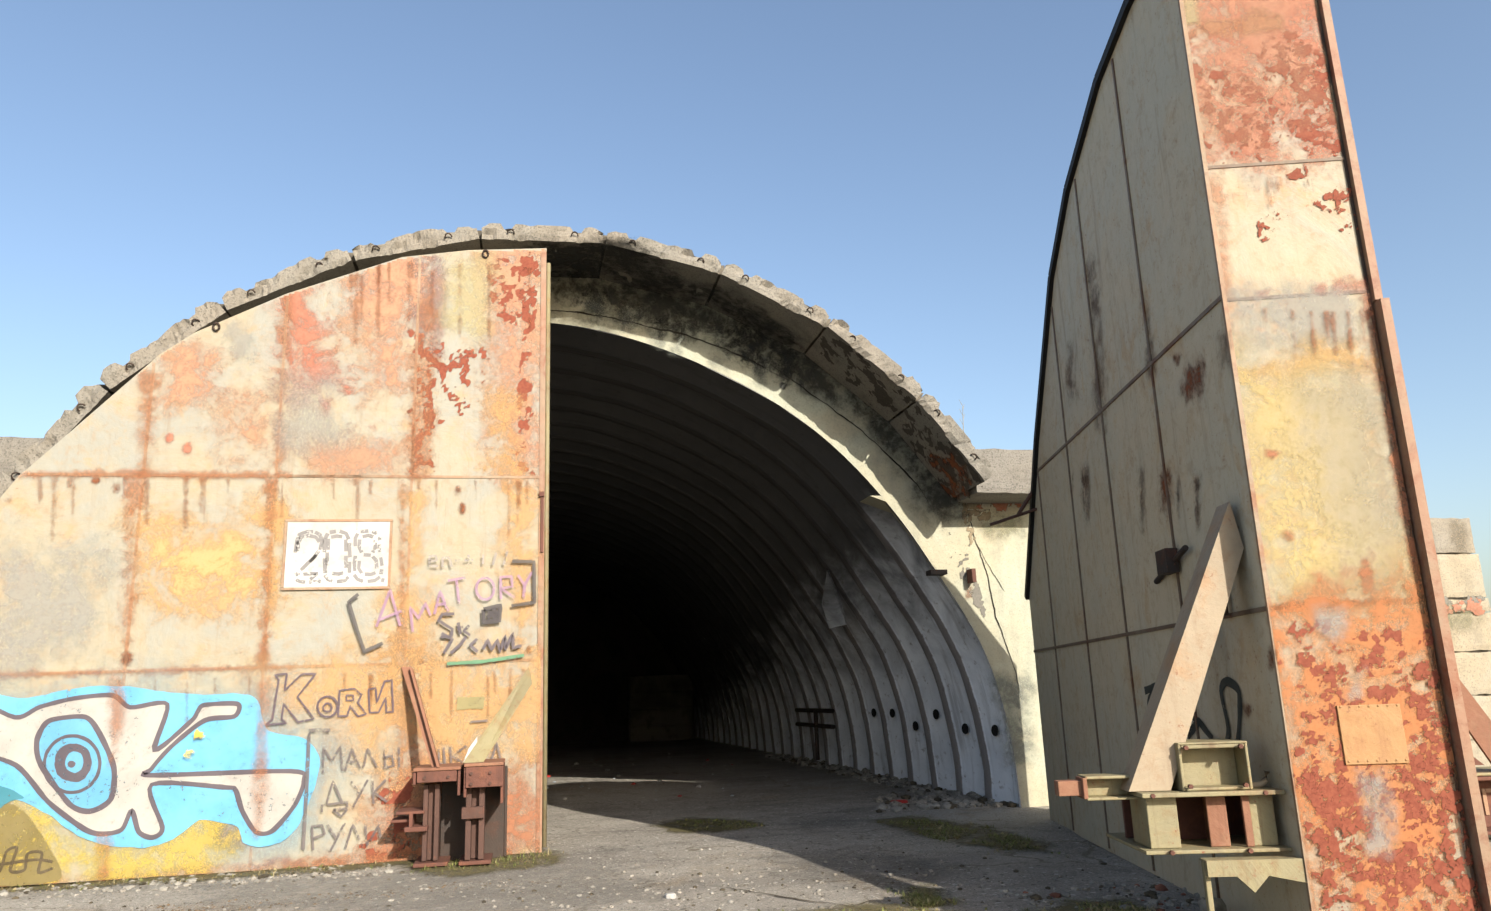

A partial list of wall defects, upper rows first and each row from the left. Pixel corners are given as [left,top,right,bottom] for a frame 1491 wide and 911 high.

corrosion [1183,0,1339,170]
corrosion [157,341,286,462]
corrosion [123,496,291,618]
corrosion [266,249,546,862]
corrosion [1254,280,1472,911]